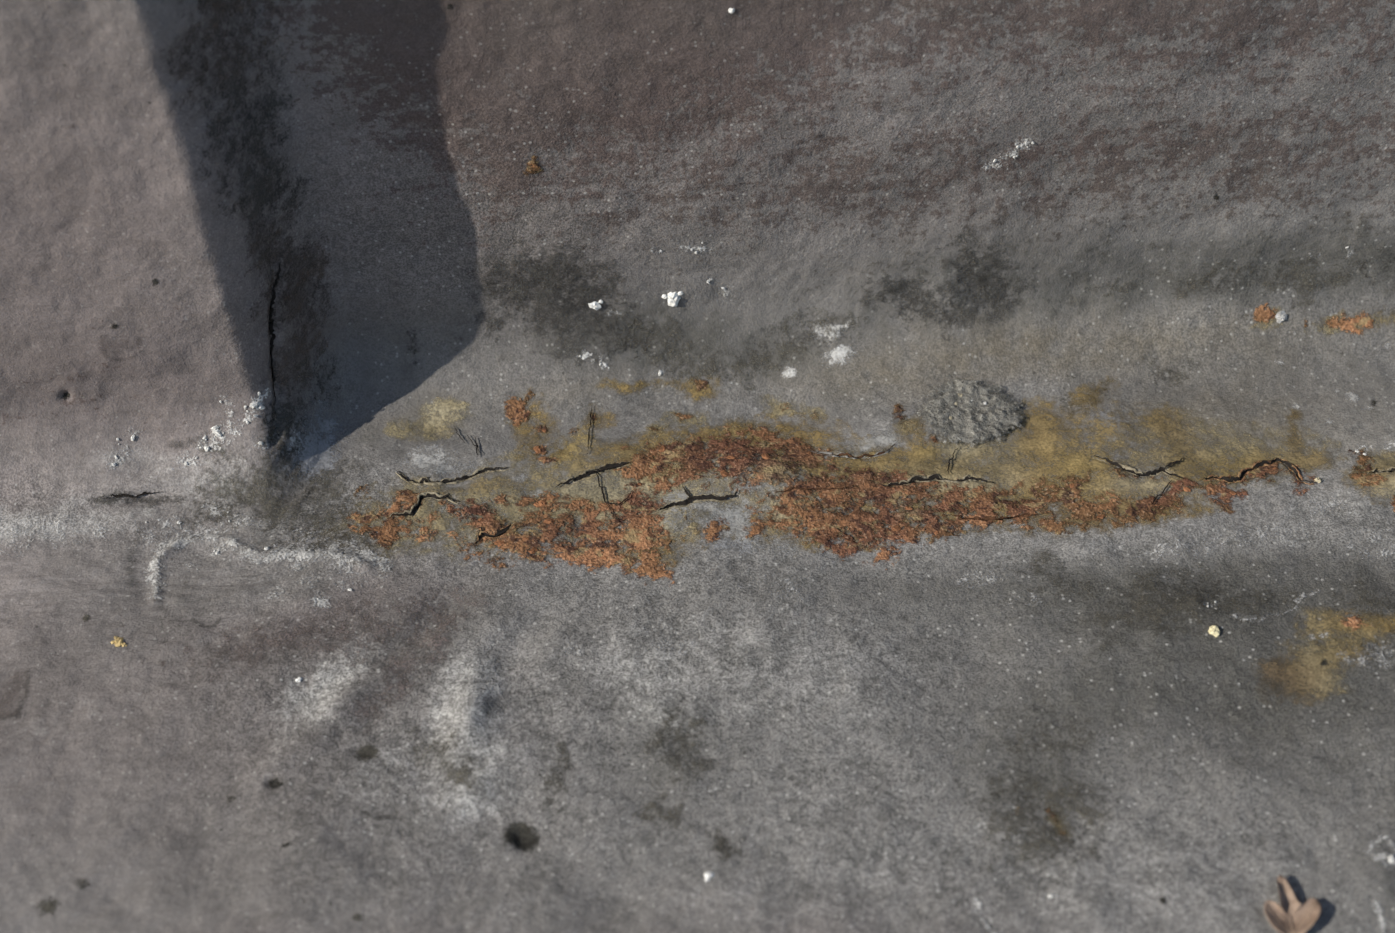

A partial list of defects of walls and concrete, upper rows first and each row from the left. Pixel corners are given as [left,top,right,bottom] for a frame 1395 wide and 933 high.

leakage [0,0,486,716]
crack [269,263,281,409]
leakage [482,242,858,390]
leakage [862,229,1034,341]
corrosion [1304,313,1395,335]
crack [388,428,512,546]
crack [556,408,740,522]
corrosion [341,378,1331,584]
crack [777,444,1043,520]
crack [1093,455,1314,505]
corrosion [1348,449,1395,512]
corrosion [1296,610,1395,653]